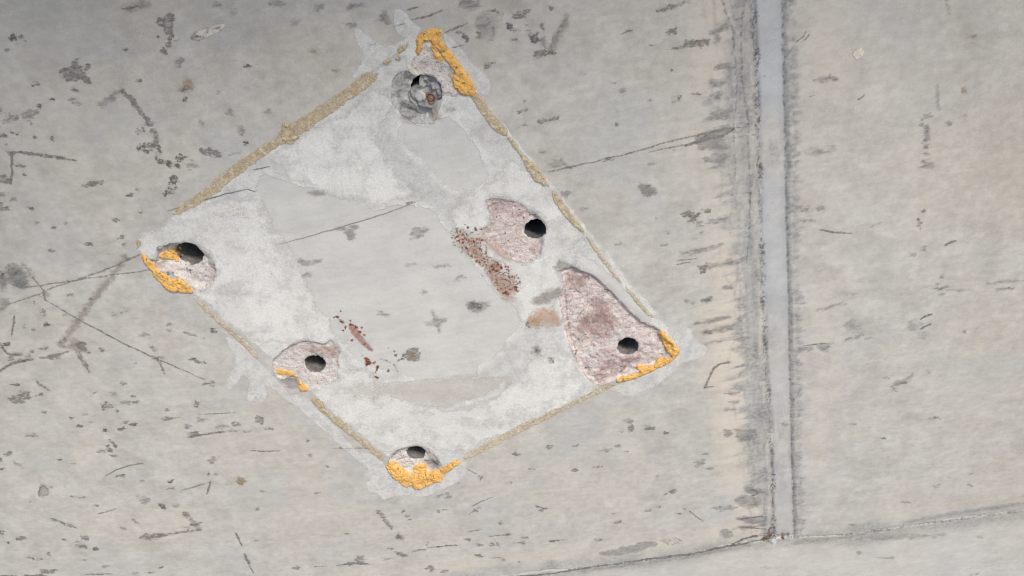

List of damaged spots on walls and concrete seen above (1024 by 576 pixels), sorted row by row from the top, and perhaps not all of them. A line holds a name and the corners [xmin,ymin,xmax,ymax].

crack [13,254,146,303]
spalling [150,242,216,292]
rust [451,224,522,298]
spalling [484,198,548,263]
crack [548,3,792,445]
crack [0,342,47,372]
spalling [272,340,341,389]
rust [333,310,397,379]
spalling [536,261,669,385]
spalling [388,445,441,474]